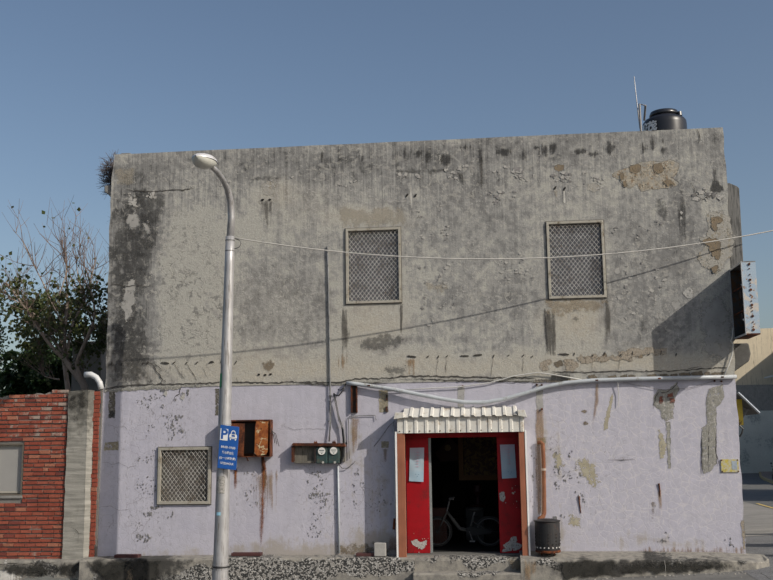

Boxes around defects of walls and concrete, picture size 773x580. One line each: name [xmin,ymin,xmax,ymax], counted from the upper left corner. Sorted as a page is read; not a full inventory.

spalling [550,159,680,192]
spalling [697,210,738,274]
water stain [544,309,556,354]
spalling [534,360,578,383]
spalling [577,347,667,364]
spalling [647,371,725,474]
peeling [550,449,600,489]
rust [260,461,277,539]
peeling [502,536,522,552]